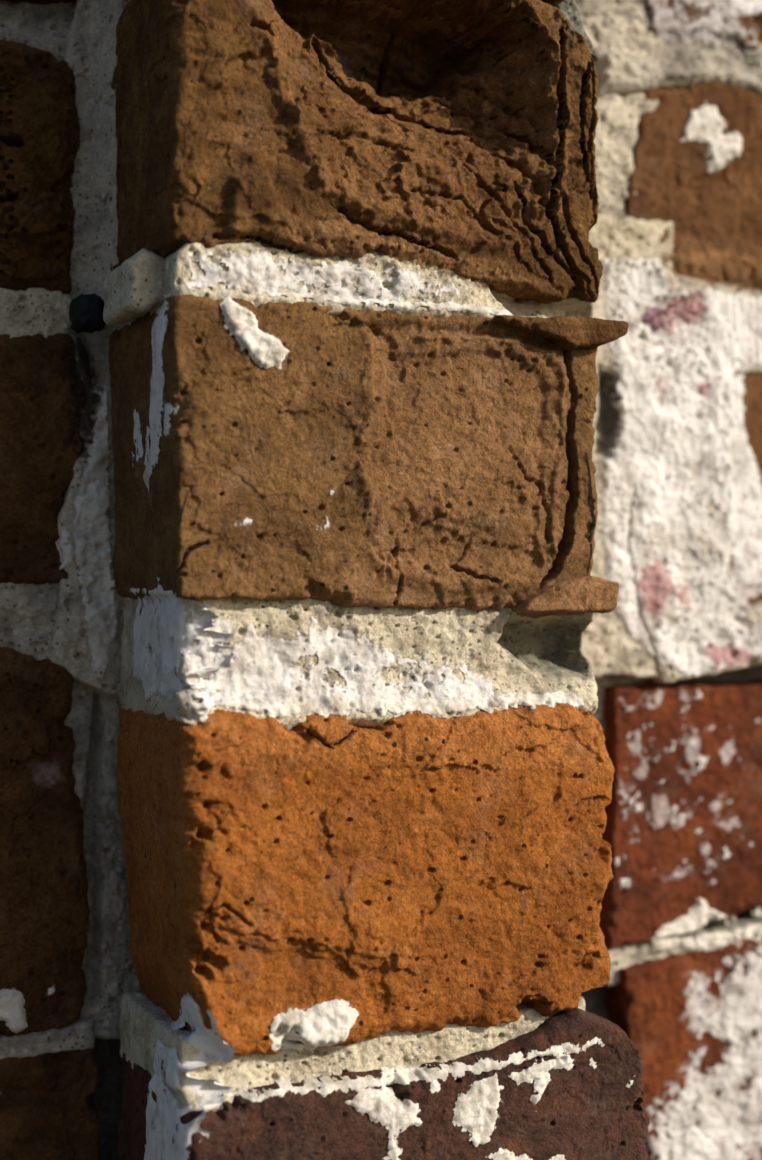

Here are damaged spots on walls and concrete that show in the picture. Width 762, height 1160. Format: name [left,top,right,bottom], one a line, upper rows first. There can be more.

spalling [238,0,580,302]
peeling [644,0,762,51]
spalling [340,242,762,785]
peeling [617,723,743,881]
peeling [144,993,235,1160]
peeling [645,898,762,1160]